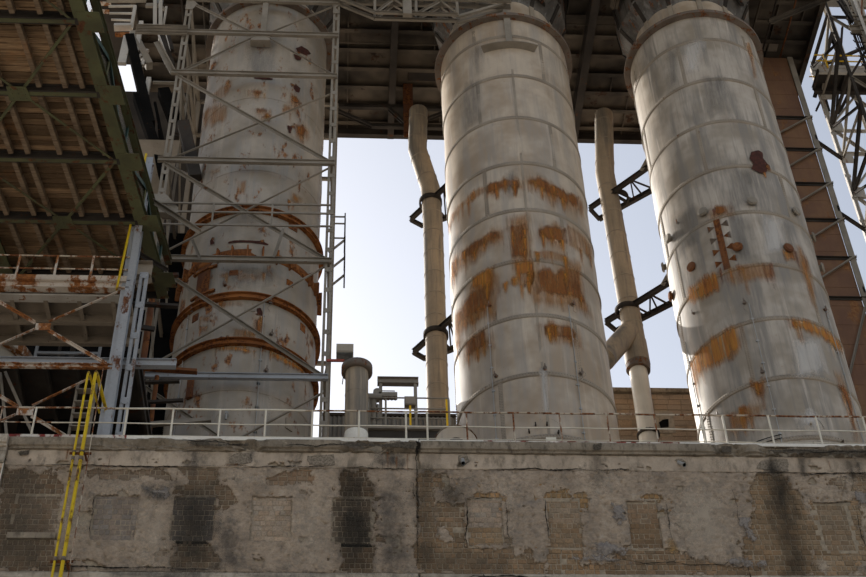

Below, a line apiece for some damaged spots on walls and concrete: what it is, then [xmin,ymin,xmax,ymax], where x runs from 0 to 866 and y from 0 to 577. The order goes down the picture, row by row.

peeling [266,470,315,495]
crack [35,439,628,577]
peeling [332,470,386,573]
spalling [340,441,415,449]
peeling [406,471,866,576]